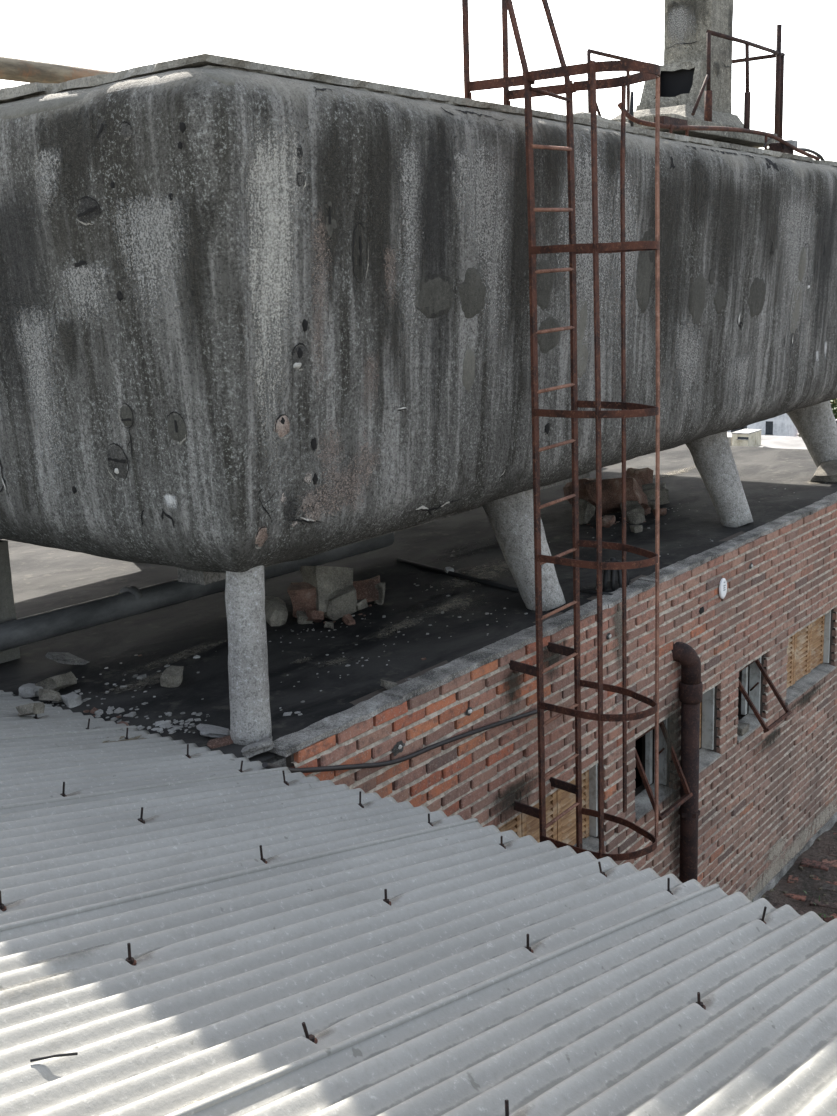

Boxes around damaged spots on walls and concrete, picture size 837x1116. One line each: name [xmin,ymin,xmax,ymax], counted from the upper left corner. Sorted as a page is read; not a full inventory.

water stain [36,109,96,204]
water stain [116,198,213,322]
water stain [246,131,298,433]
water stain [317,124,837,409]
water stain [0,191,107,473]
spalling [106,443,129,481]
spalling [118,403,134,428]
spalling [167,411,187,444]
spalling [274,414,290,439]